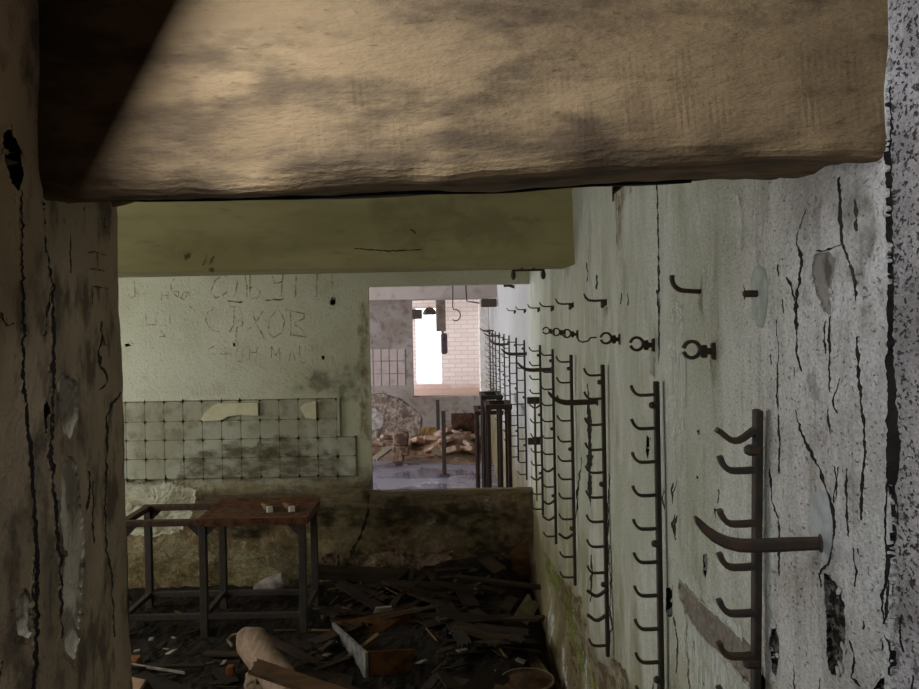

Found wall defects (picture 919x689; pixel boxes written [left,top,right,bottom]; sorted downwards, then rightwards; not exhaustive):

spalling [0,123,26,197]
crack [124,179,692,364]
peeling [809,245,838,319]
crack [0,190,72,689]
water stain [177,436,339,480]
crack [768,86,915,689]
peeling [41,369,87,668]
water stain [545,553,628,689]
peeling [665,580,751,687]
spalling [761,624,781,689]
spalling [822,569,849,683]
spalling [865,674,887,689]